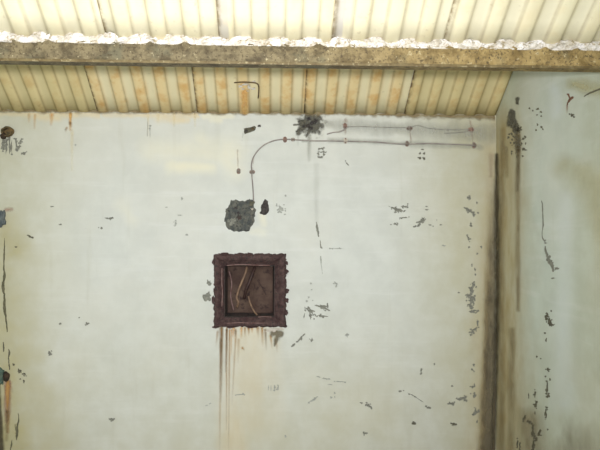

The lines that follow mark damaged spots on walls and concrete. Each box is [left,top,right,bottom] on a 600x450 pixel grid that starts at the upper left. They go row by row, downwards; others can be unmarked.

spalling [224,195,286,232]
peeling [303,283,330,319]
peeling [458,264,480,336]
leakage [459,97,583,450]
crack [541,201,559,279]
corrosion [207,327,290,450]
peeling [522,415,549,450]